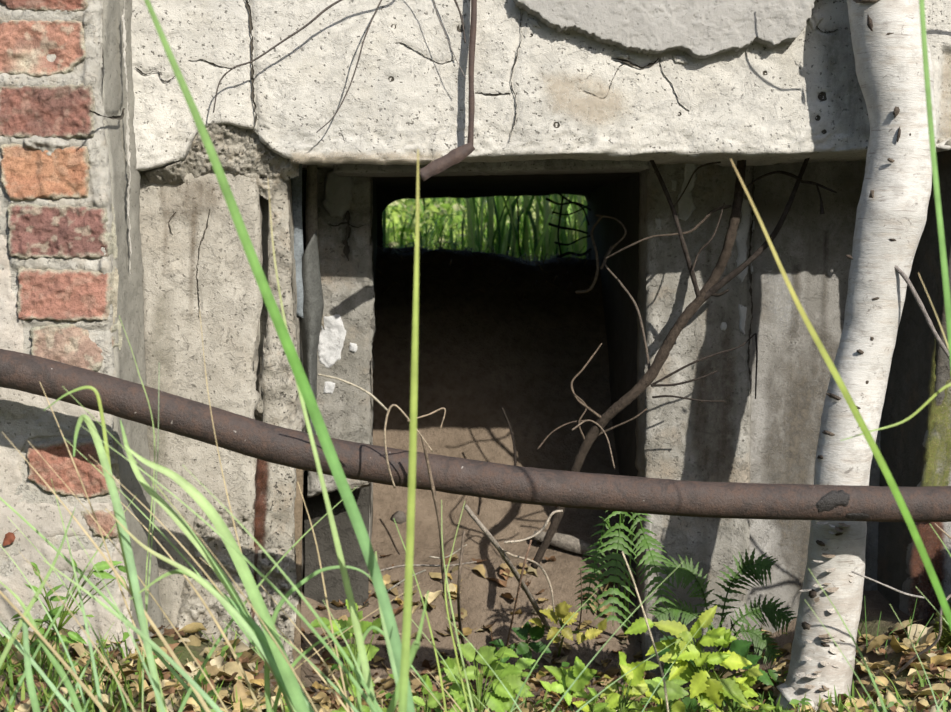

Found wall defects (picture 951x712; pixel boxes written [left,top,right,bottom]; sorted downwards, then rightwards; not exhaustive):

crack [245,0,257,134]
crack [477,13,522,142]
crack [583,58,688,110]
flaking render [513,0,823,65]
crack [89,2,228,274]
spalling [144,119,300,200]
crack [196,210,210,315]
peeling [318,314,358,368]
peeling [323,381,335,394]
water stain [768,335,839,484]
water stain [778,520,811,590]